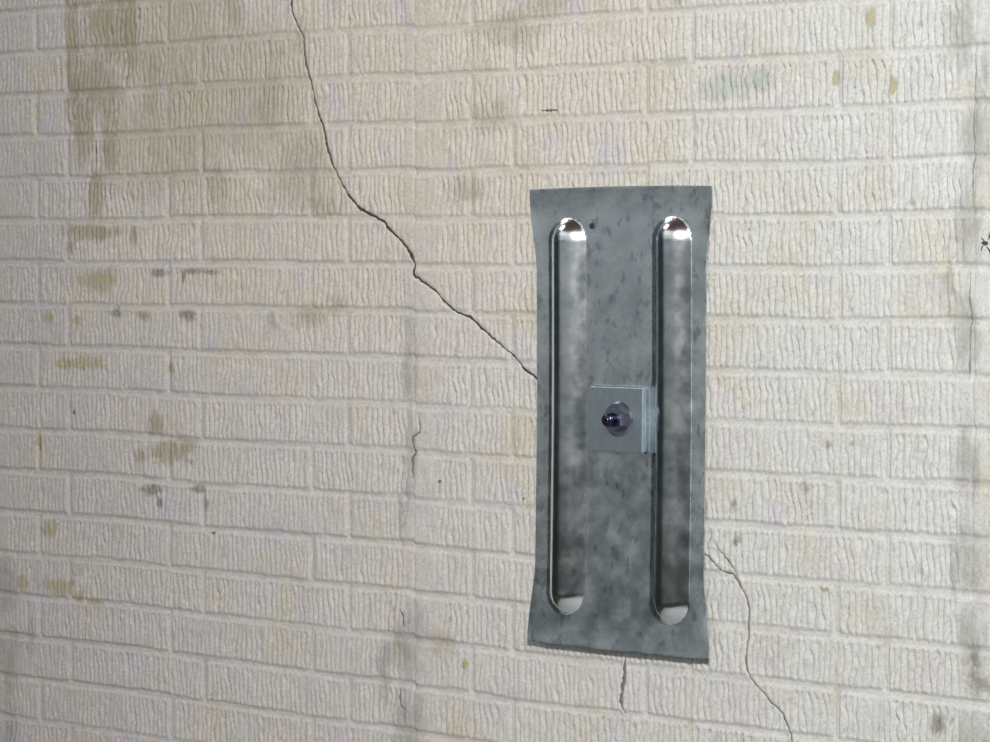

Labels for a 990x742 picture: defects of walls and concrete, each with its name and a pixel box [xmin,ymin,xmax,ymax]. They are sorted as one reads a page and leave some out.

crack [291,0,537,380]
crack [411,416,421,478]
crack [618,658,626,713]
crack [705,543,793,742]